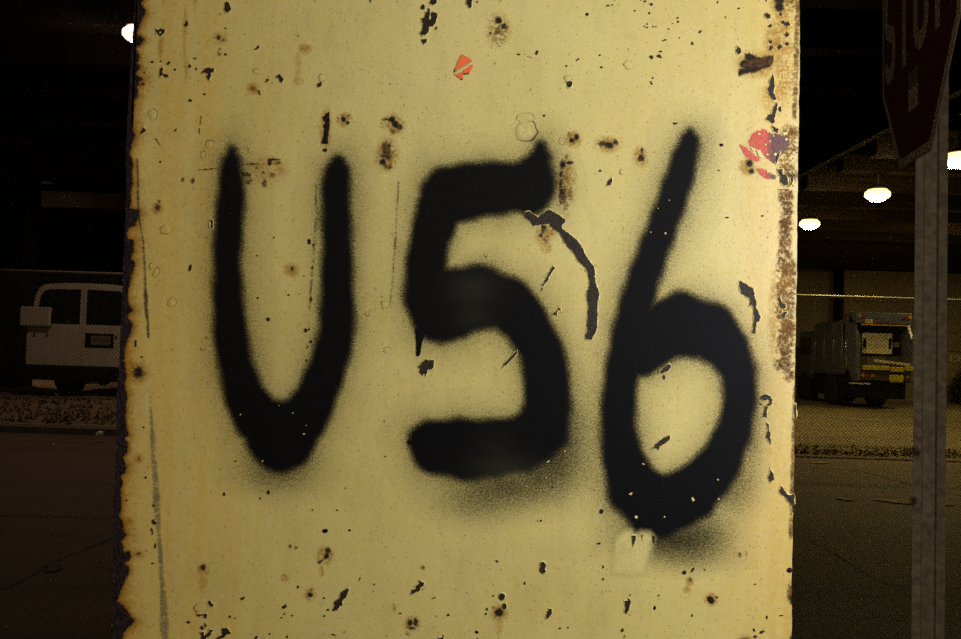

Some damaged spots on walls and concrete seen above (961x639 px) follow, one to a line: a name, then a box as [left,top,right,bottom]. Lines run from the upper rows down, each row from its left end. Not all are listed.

peeling [419,0,438,45]
rust [489,17,508,44]
peeling [740,74,794,191]
rust [738,0,800,400]
rust [111,0,161,639]
peeling [738,280,762,334]
peeling [187,600,236,639]